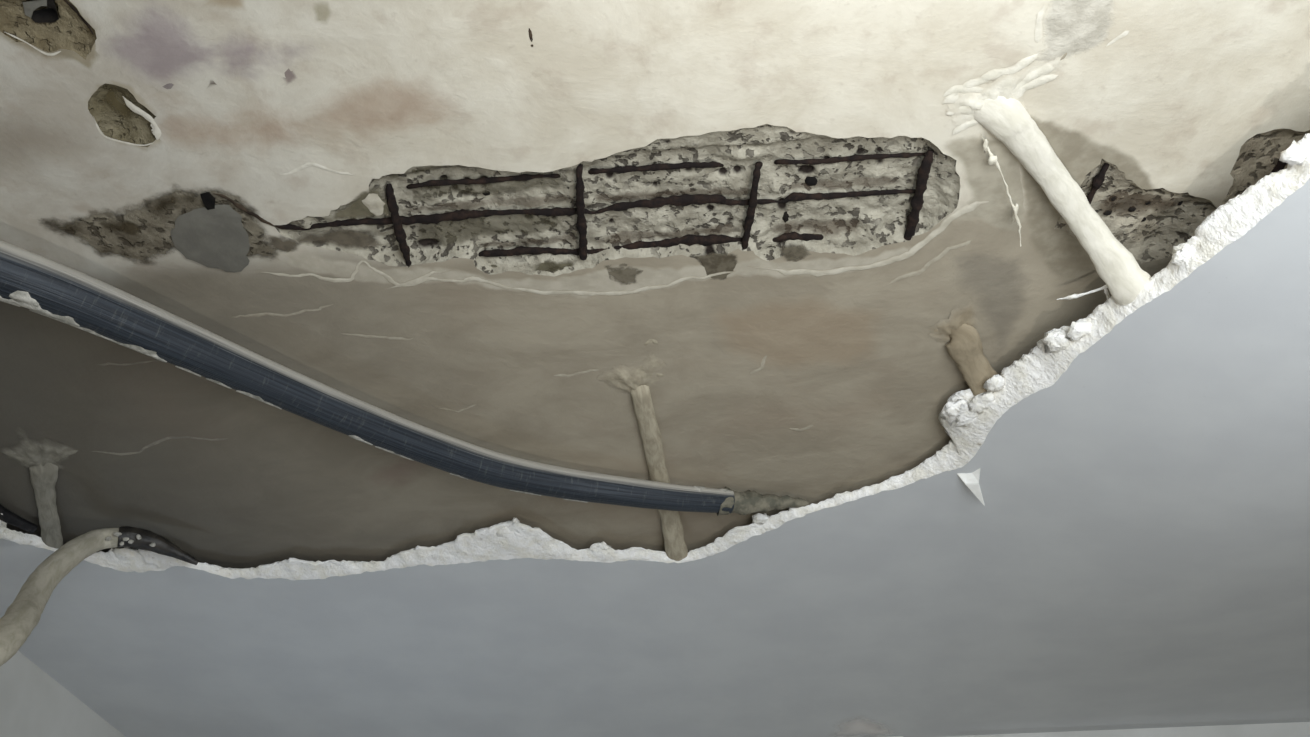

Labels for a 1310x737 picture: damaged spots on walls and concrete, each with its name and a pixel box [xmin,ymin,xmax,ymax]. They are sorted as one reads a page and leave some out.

flaking render [0,0,97,60]
flaking render [88,83,162,147]
spalling [45,113,1310,580]
flaking render [0,513,58,552]